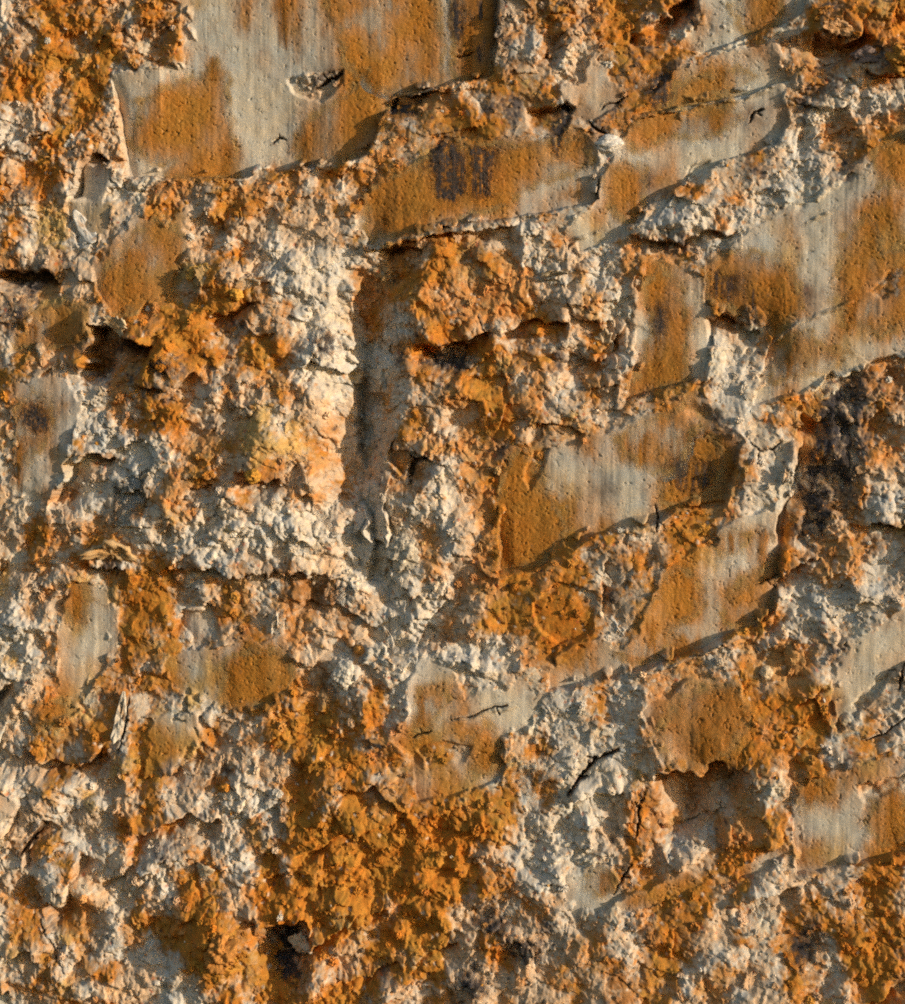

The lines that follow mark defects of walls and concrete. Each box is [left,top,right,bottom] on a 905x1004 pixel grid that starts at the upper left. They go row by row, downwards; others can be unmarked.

corrosion [127,56,241,181]
corrosion [296,0,500,165]
corrosion [364,136,596,238]
spalling [369,216,631,442]
leakage [798,380,857,532]
corrosion [492,448,567,573]
spalling [0,688,127,779]
crack [565,745,621,799]
crack [613,790,646,895]
spalling [639,760,755,859]
crack [863,664,905,741]
leakage [273,925,301,979]